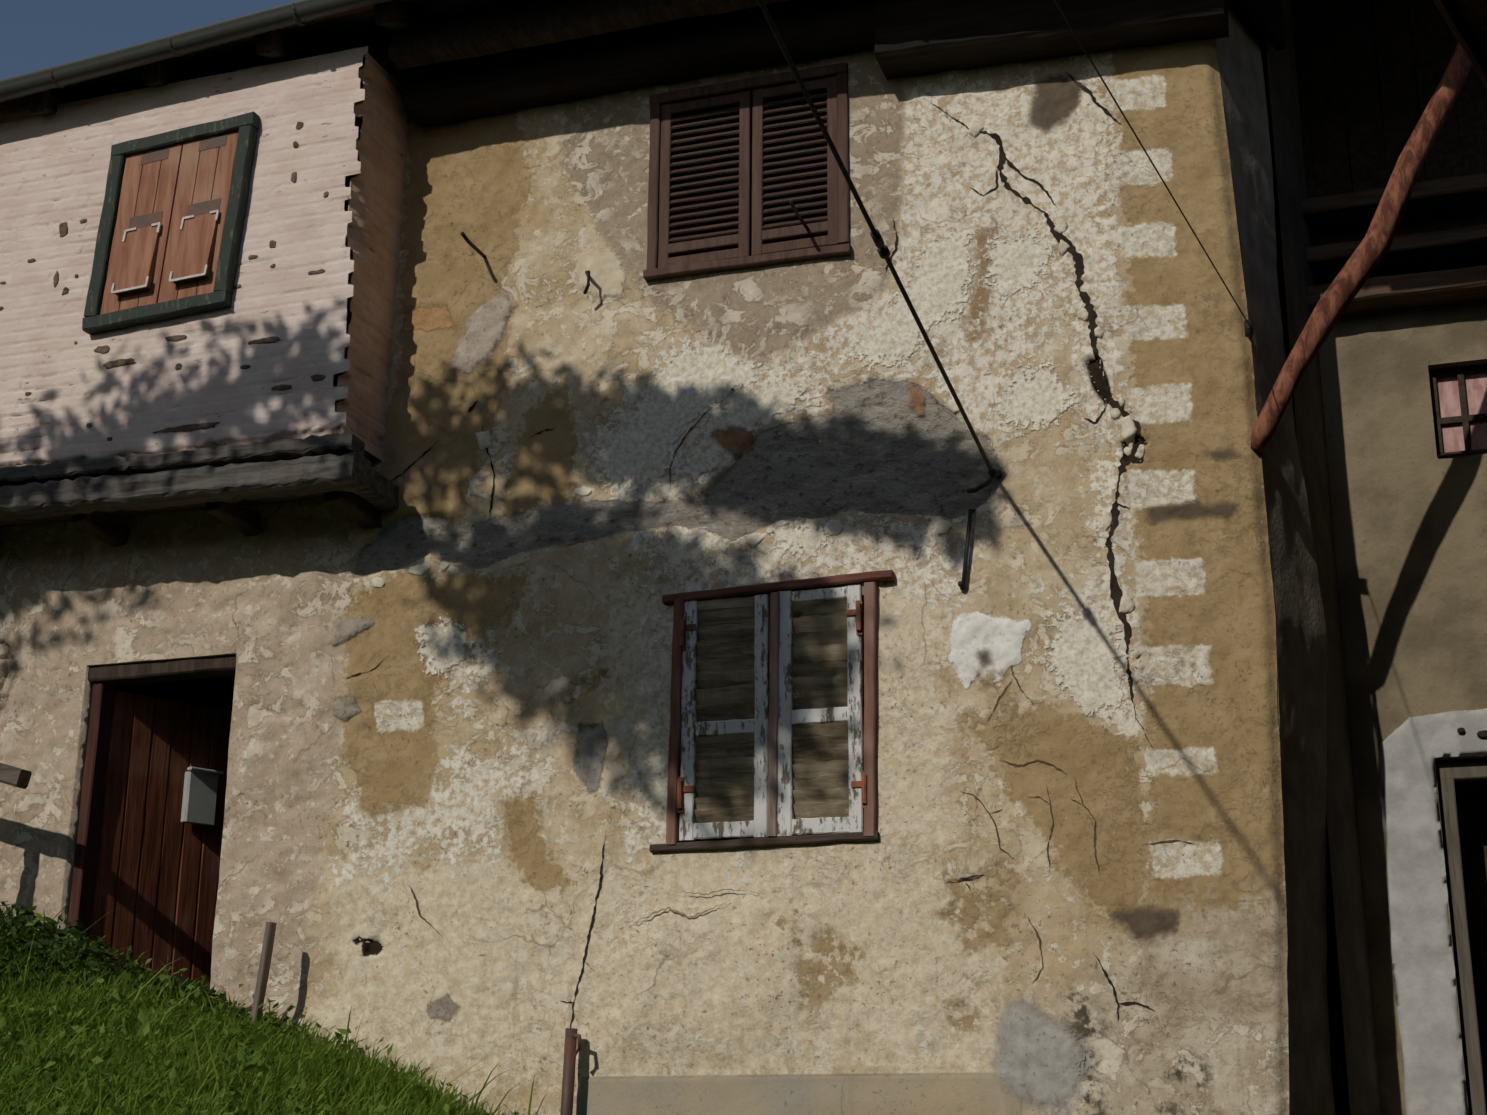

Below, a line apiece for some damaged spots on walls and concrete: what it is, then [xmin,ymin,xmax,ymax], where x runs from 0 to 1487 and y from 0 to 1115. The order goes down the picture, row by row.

crack [1067,73,1121,124]
spalling [353,226,1079,588]
crack [924,98,1152,747]
crack [946,759,1101,889]
crack [562,830,606,1028]
crack [1027,916,1043,984]
crack [1093,952,1154,1019]